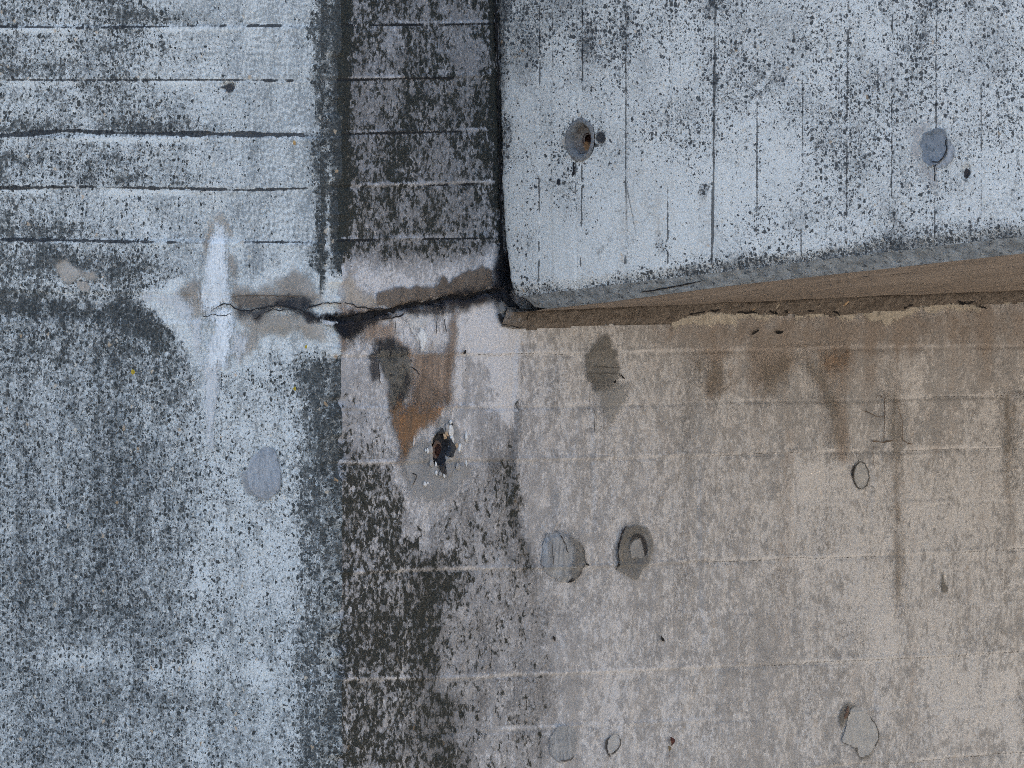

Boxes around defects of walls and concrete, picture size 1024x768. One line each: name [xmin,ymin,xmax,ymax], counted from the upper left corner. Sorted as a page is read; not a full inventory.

water stain [143,213,513,449]
crack [203,290,495,334]
corrosion [363,314,457,460]